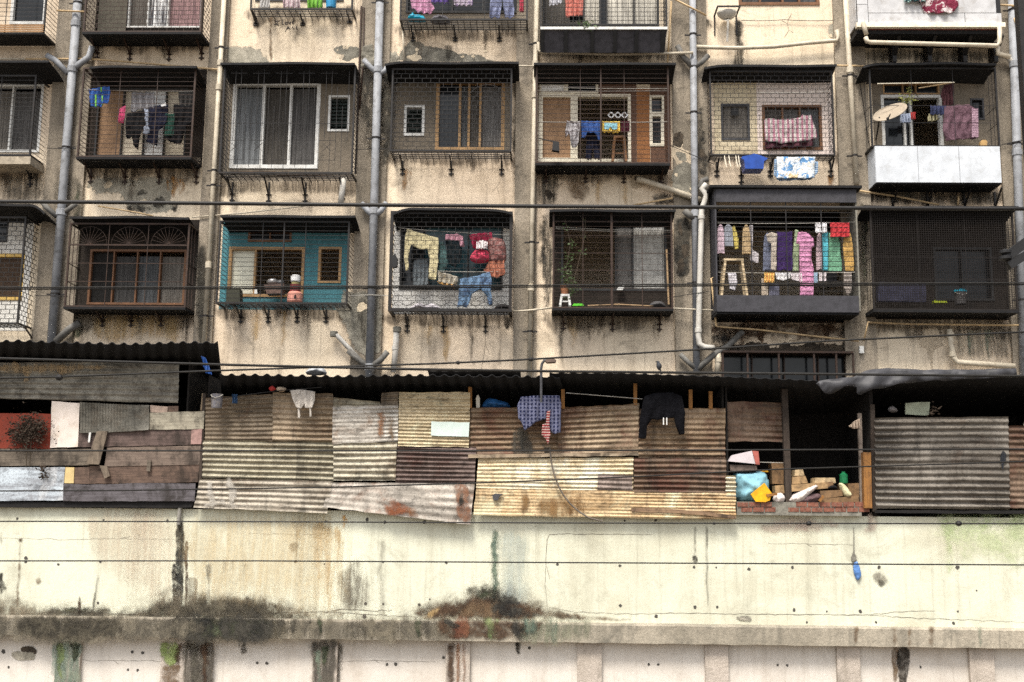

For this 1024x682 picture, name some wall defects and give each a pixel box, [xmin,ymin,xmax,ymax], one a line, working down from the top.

corrosion [386,502,415,516]
corrosion [455,484,471,522]
damp [0,523,606,682]
damp [892,631,910,682]